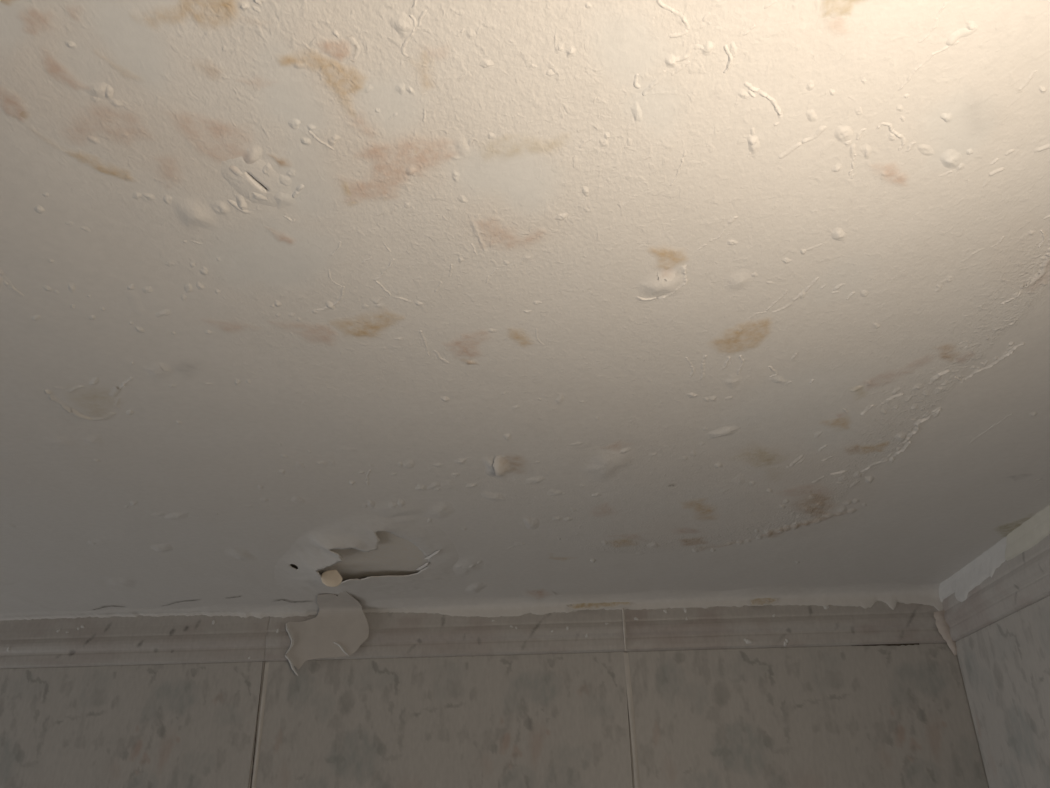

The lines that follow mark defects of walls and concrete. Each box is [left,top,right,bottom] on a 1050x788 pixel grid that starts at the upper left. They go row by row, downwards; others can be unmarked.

damp [0,0,296,193]
damp [184,35,575,208]
damp [813,0,874,69]
damp [197,305,407,349]
damp [703,315,777,357]
peeling [285,531,429,676]